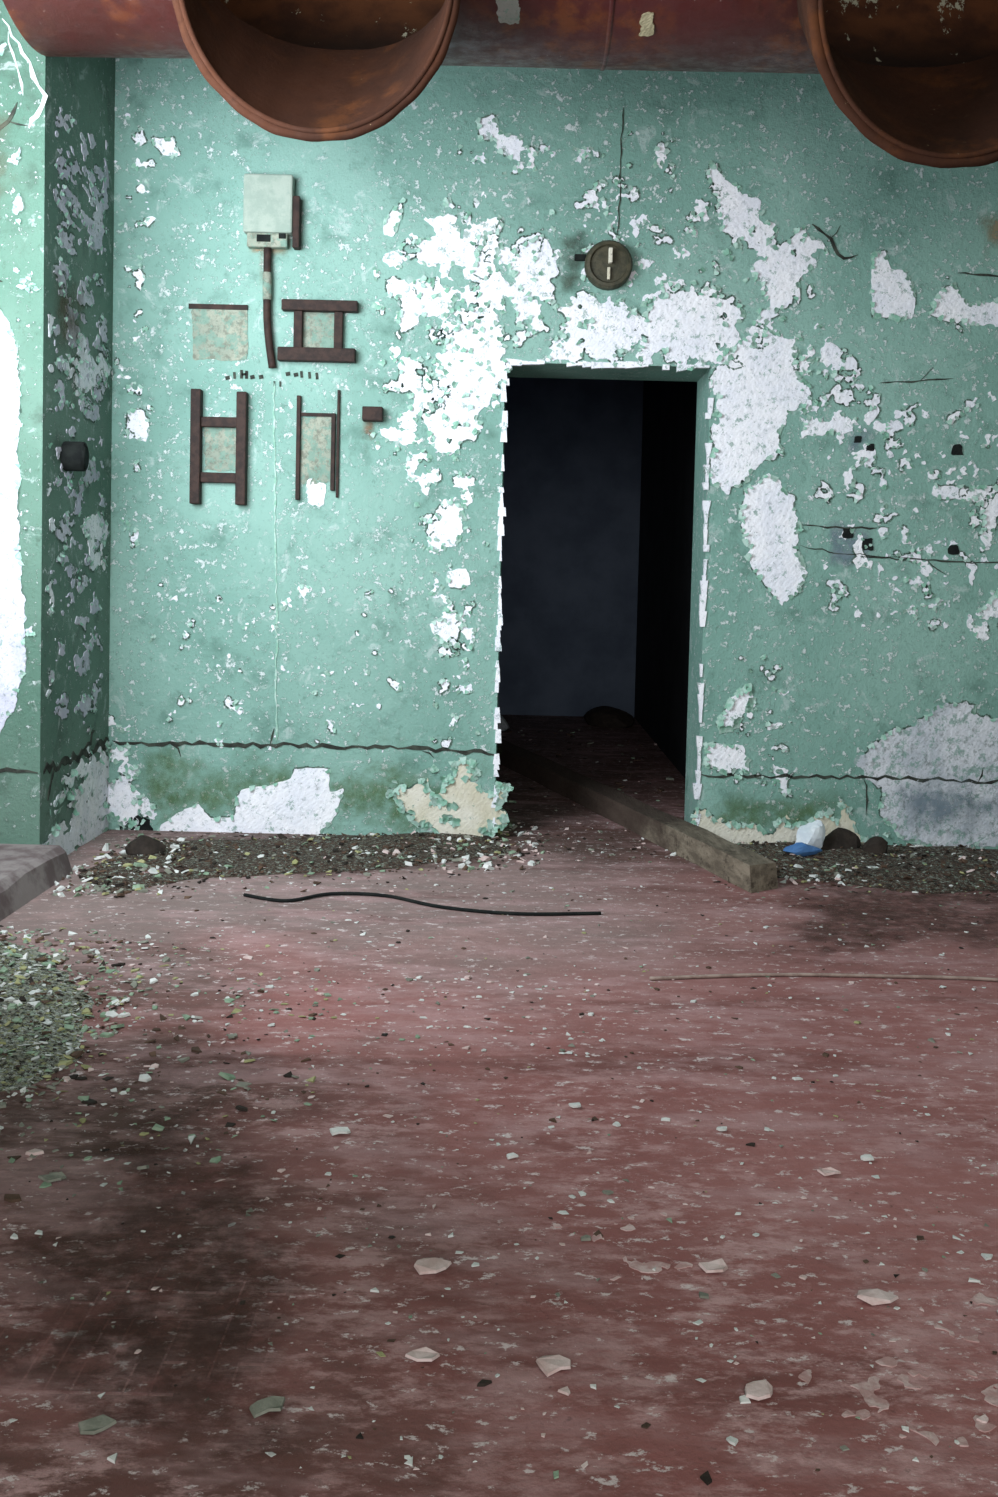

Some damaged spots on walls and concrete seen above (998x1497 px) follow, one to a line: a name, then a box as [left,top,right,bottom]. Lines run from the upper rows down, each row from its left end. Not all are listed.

peeling [496,0,521,25]
peeling [639,12,654,37]
peeling [0,107,344,856]
peeling [370,113,998,849]
peeling [355,587,394,636]
peeling [307,648,405,745]